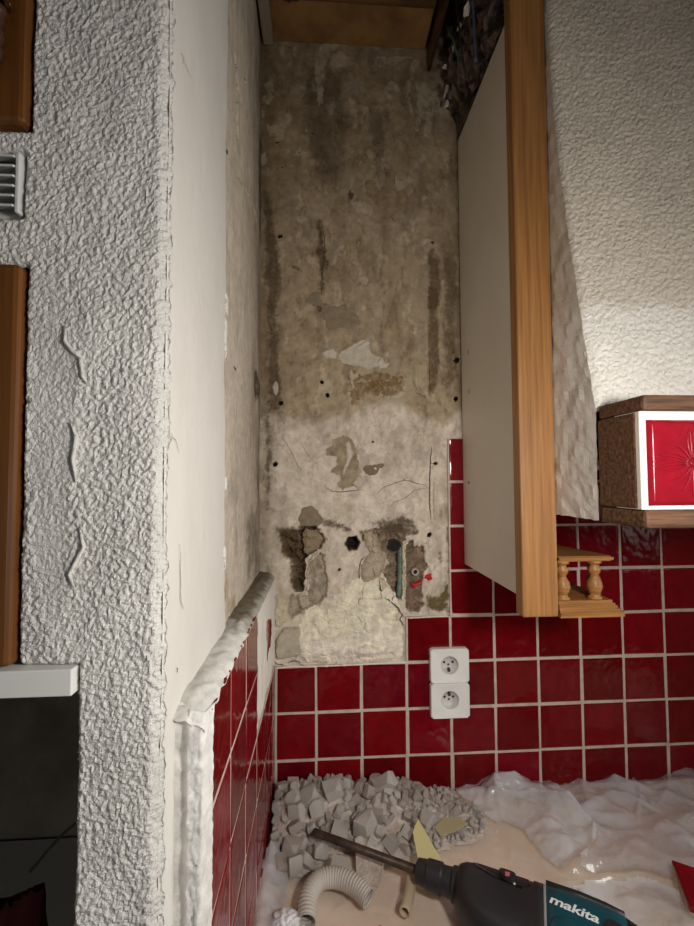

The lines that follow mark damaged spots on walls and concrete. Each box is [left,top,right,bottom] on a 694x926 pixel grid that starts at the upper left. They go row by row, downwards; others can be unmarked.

leakage [254,139,281,411]
leakage [316,221,329,276]
peeling [306,291,359,330]
leakage [428,249,441,390]
flaking render [322,339,405,408]
peeling [324,435,384,490]
crack [325,446,436,519]
flaking render [277,506,331,623]
flaking render [343,522,431,615]